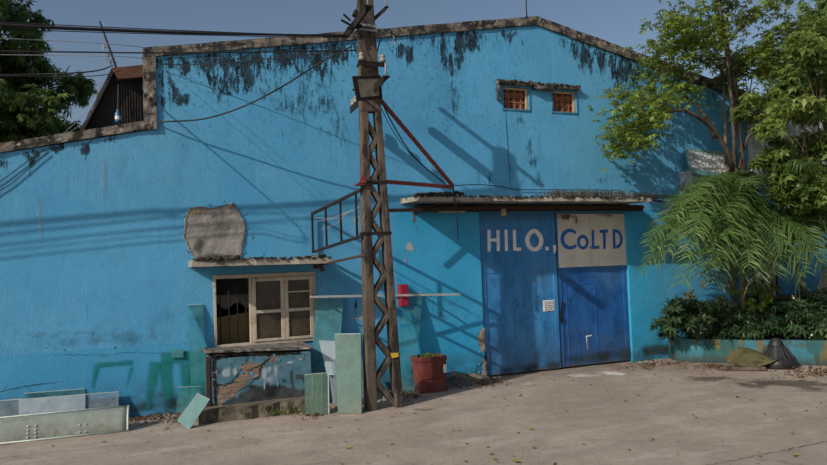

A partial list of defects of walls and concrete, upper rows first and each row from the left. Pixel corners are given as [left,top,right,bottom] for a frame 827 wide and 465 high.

water stain [156,41,357,148]
water stain [384,27,524,112]
water stain [22,149,39,176]
flaking render [182,201,254,258]
flaking render [212,354,280,406]